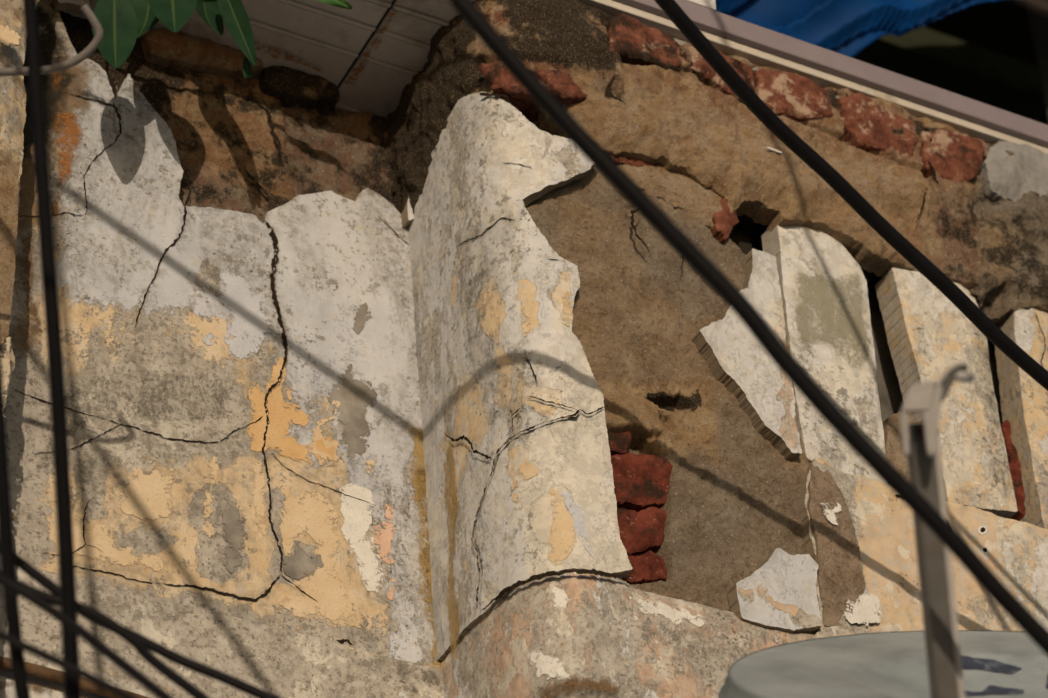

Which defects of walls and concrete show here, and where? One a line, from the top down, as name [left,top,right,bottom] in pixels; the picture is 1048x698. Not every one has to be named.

crack [20,77,122,217]
crack [257,98,282,160]
spalling [51,0,567,229]
spalling [473,0,919,291]
spalling [719,51,1048,324]
peeling [73,512,163,572]
crack [15,168,371,602]
peeling [201,356,396,628]
peeling [353,303,373,334]
crack [444,358,634,610]
peeling [528,650,571,681]
flaking render [526,166,881,627]